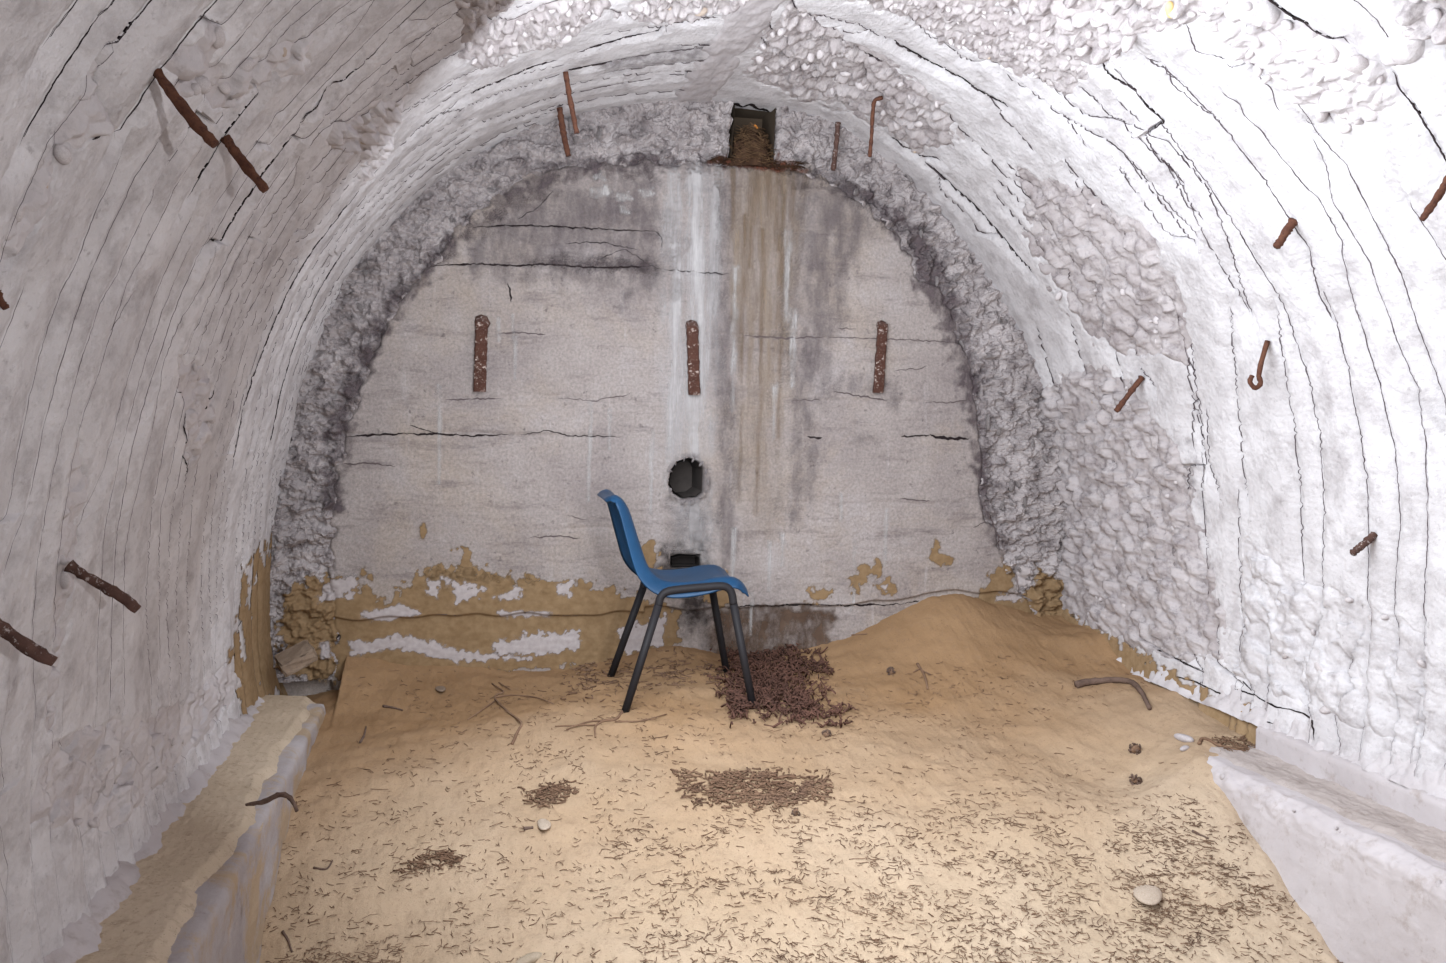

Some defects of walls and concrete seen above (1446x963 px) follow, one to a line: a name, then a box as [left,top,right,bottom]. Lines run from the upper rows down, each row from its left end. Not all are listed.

spalling [269,94,734,685]
crack [433,191,727,335]
crack [745,327,968,441]
damp [778,169,992,518]